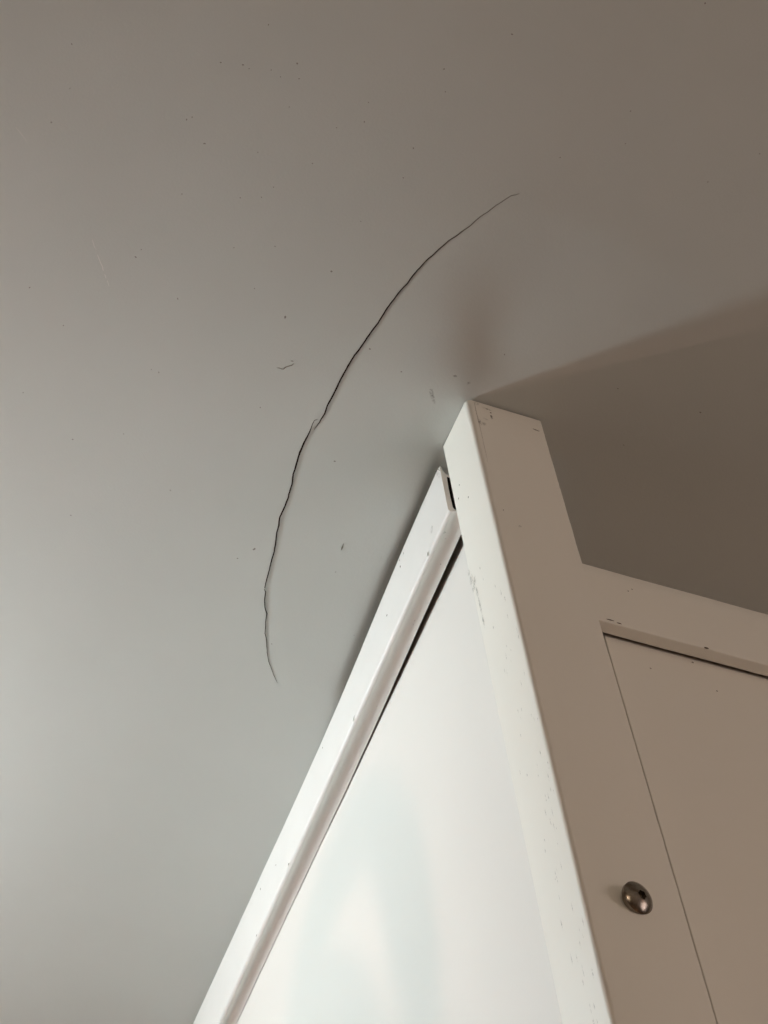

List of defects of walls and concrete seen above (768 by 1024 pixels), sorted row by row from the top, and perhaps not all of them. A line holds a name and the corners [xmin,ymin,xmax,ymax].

crack [264,194,518,677]